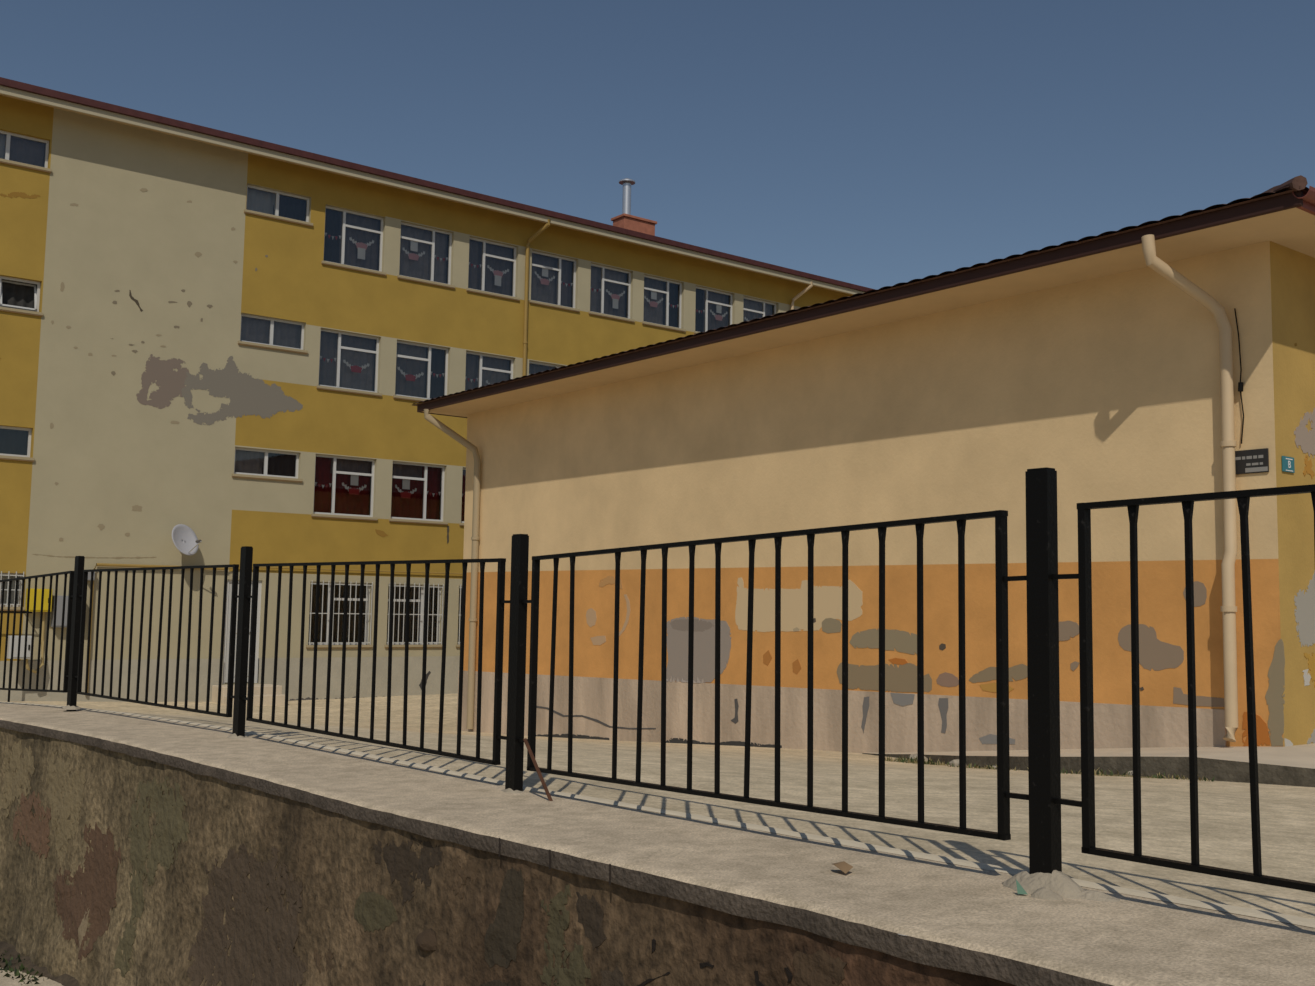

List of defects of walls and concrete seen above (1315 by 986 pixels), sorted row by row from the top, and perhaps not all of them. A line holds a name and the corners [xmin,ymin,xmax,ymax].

peeling [129,326,303,426]
peeling [1294,408,1315,458]
peeling [735,577,863,632]
peeling [1265,570,1315,746]